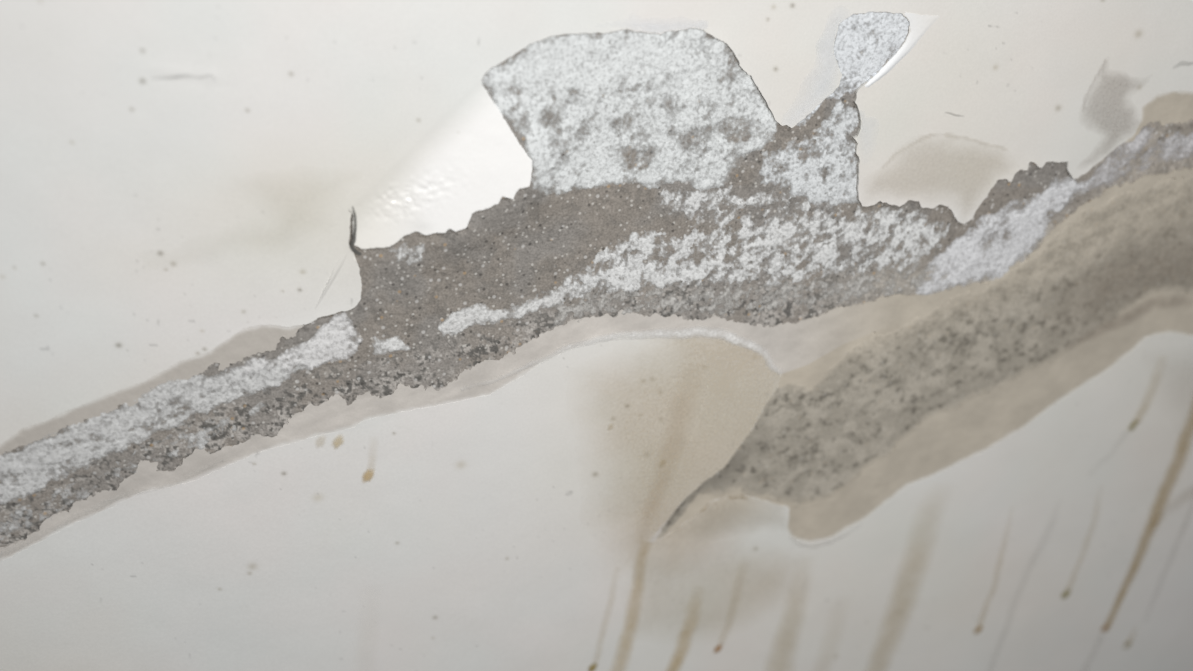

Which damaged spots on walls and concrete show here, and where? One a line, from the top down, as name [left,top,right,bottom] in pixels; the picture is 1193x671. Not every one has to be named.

peeling [619,249,642,266]
peeling [628,174,1193,544]
peeling [167,402,194,418]